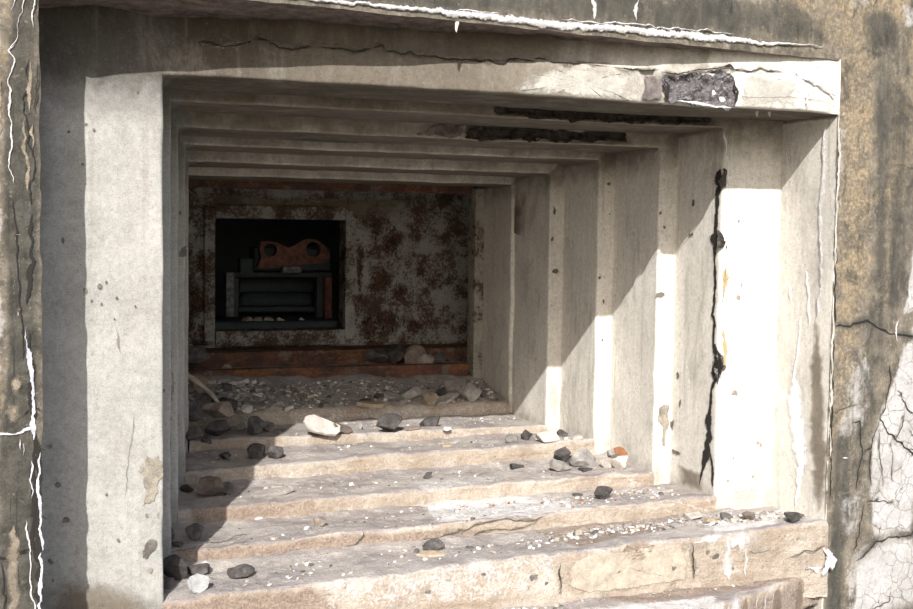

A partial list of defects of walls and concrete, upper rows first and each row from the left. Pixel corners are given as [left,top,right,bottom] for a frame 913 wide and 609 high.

crack [196,36,781,77]
spalling [417,68,795,143]
crack [0,60,46,609]
corrosion [188,287,209,346]
corrosion [357,212,419,345]
crack [699,169,725,487]
water stain [788,127,828,504]
crack [829,249,913,562]
water stain [806,548,837,576]